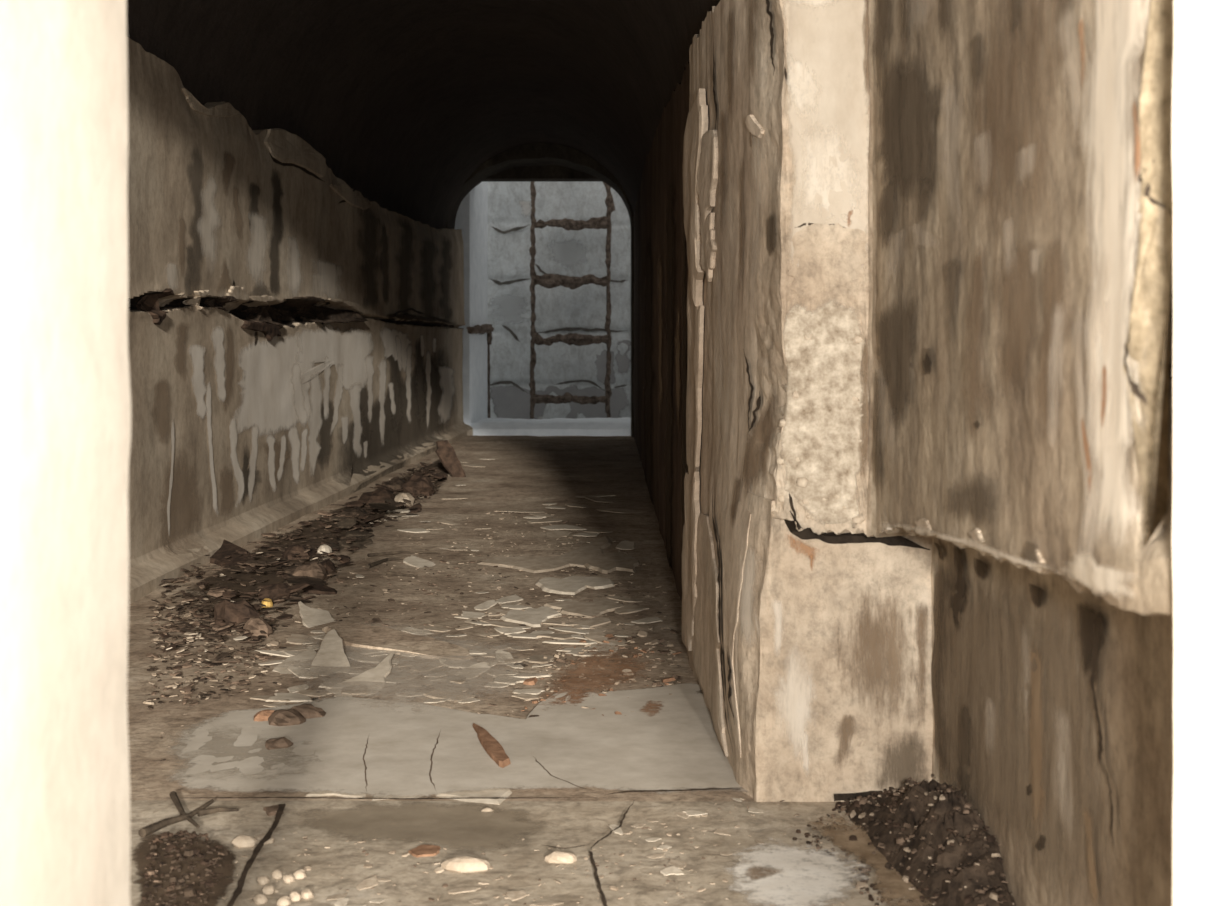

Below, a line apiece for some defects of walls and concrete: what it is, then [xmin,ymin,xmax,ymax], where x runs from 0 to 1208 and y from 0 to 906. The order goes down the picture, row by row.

crack [766,0,791,88]
water stain [167,150,342,299]
water stain [1084,0,1151,541]
water stain [154,325,455,546]
crack [692,496,751,759]
crack [743,350,761,438]
spalling [776,300,869,528]
crack [784,493,930,550]
water stain [860,300,932,486]
spalling [922,354,931,374]
peeling [968,528,984,543]
water stain [851,542,1105,891]